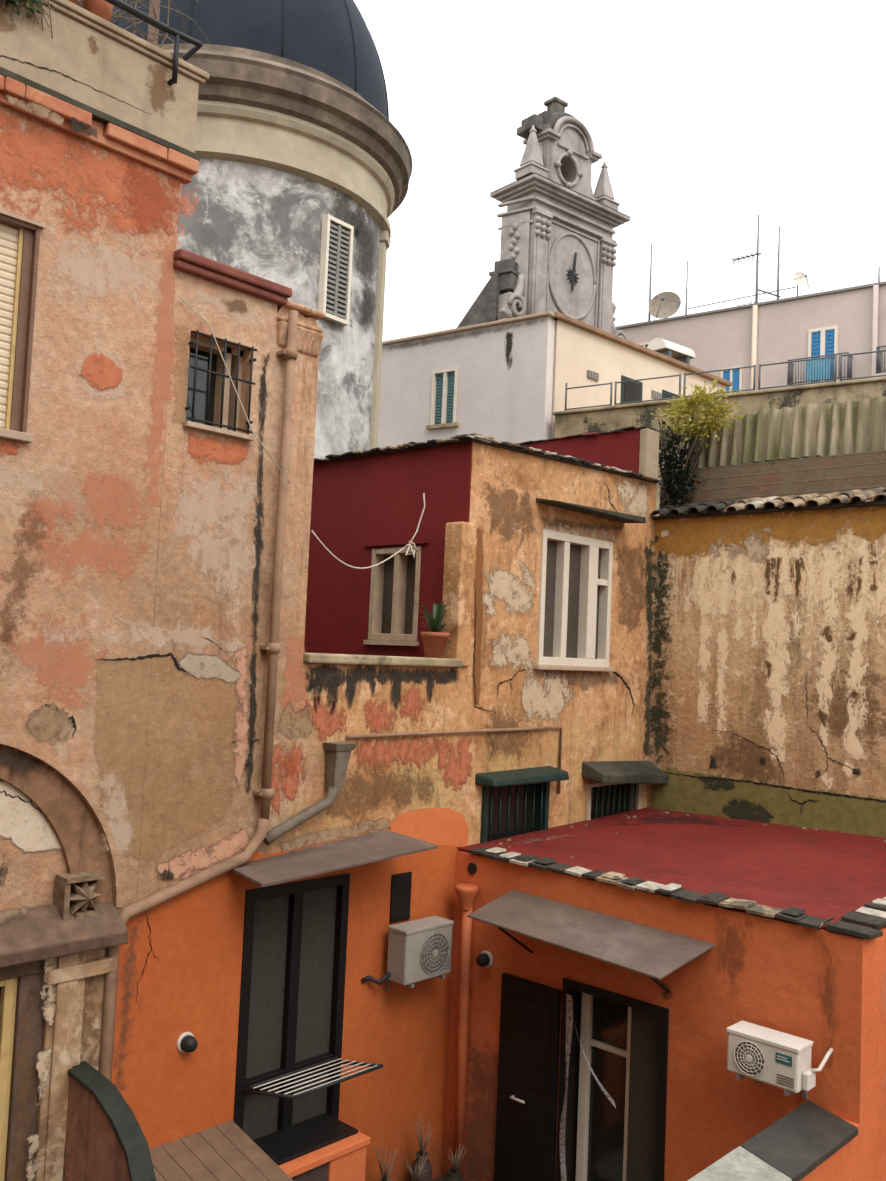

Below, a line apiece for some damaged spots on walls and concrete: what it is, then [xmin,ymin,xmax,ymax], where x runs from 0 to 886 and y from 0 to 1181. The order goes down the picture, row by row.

damp [329,188,379,332]
damp [636,405,656,427]
damp [768,390,806,409]
crack [96,653,189,673]
damp [306,664,458,716]
peeling [482,560,575,724]
peeling [682,524,886,804]
peeling [26,702,73,744]
peeling [0,780,62,854]